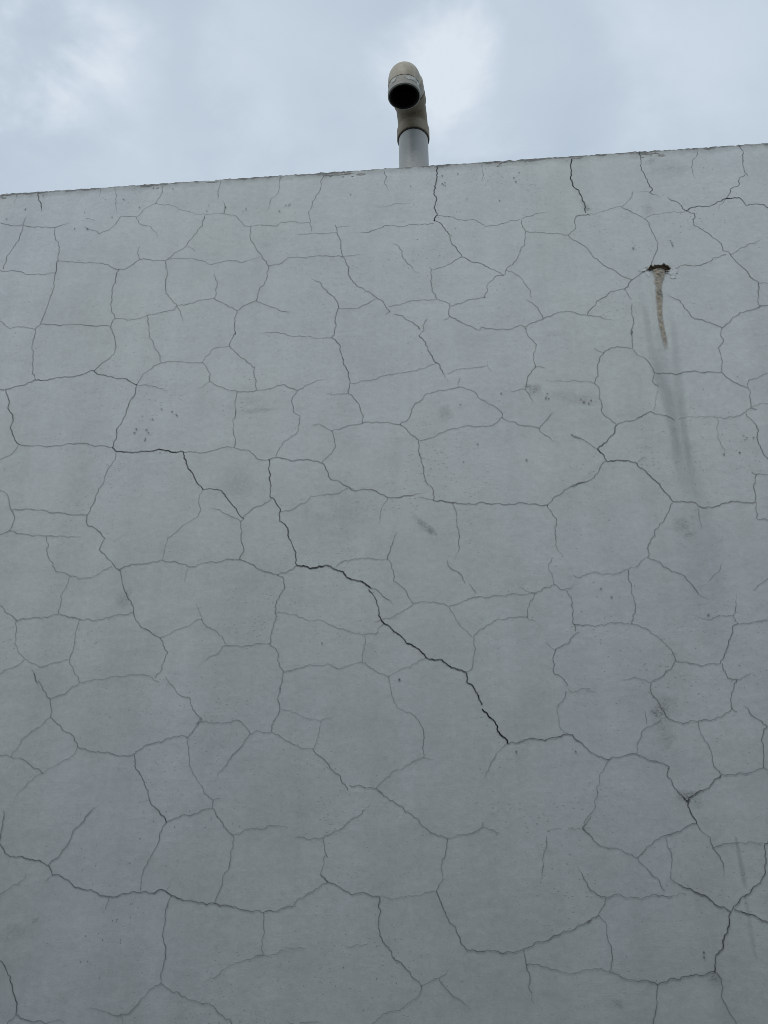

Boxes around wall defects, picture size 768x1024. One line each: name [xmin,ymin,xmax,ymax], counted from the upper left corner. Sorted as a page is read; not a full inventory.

crack [434,167,514,273]
corrosion [653,268,667,342]
crack [0,357,767,860]
crack [0,812,405,967]
crack [436,885,605,990]
crack [637,843,767,1012]